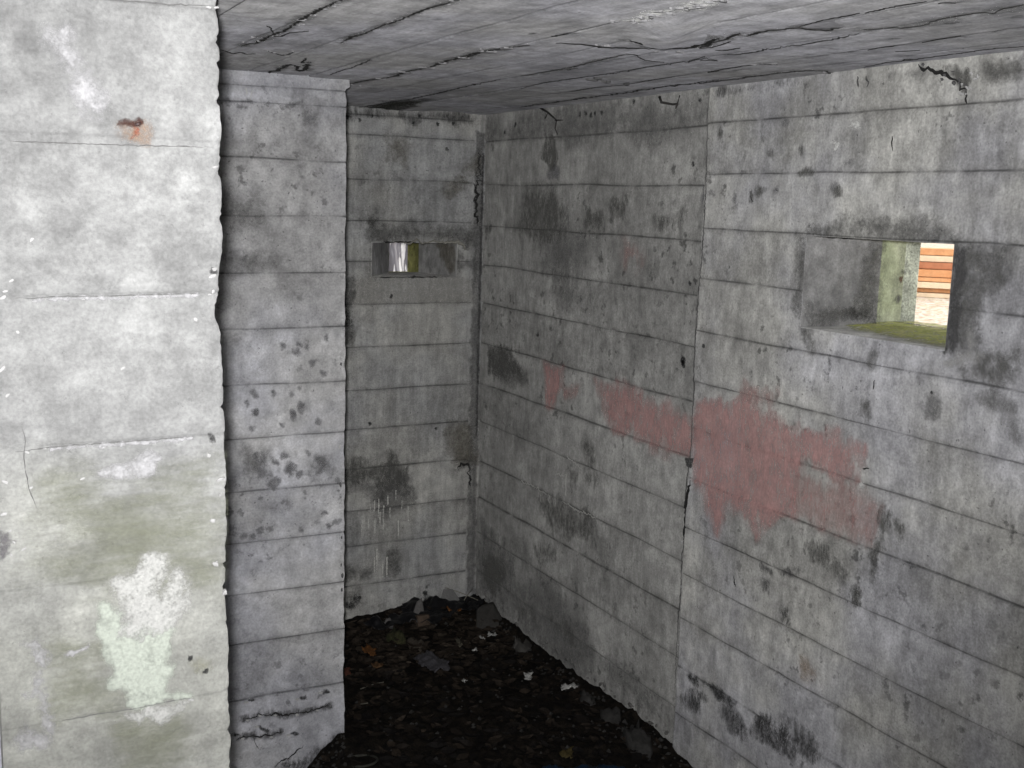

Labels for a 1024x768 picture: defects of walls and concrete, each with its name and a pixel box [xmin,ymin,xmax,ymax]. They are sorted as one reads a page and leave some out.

crack [222,0,1024,107]
corrosion [119,118,145,141]
crack [473,149,481,228]
leakage [438,130,597,666]
crack [675,118,708,683]
leakage [345,453,414,540]
crack [457,462,472,488]
crack [237,703,332,767]
leakage [681,674,818,761]